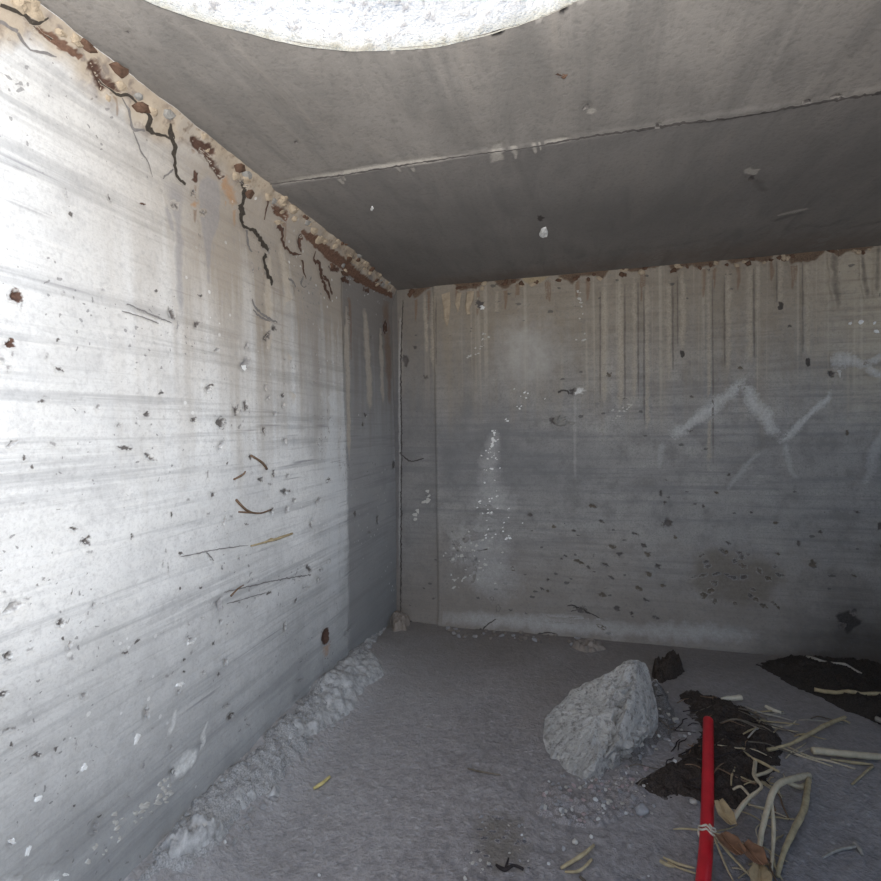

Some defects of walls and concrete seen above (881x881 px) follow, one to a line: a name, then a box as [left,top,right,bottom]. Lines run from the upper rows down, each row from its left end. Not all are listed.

crack [0,2,57,58]
crack [97,79,186,186]
corrosion [189,168,200,227]
corrosion [216,171,239,231]
corrosion [404,219,881,325]
leakage [598,277,653,447]
leakage [705,262,761,488]
leakage [439,429,803,648]
leakage [85,721,208,865]